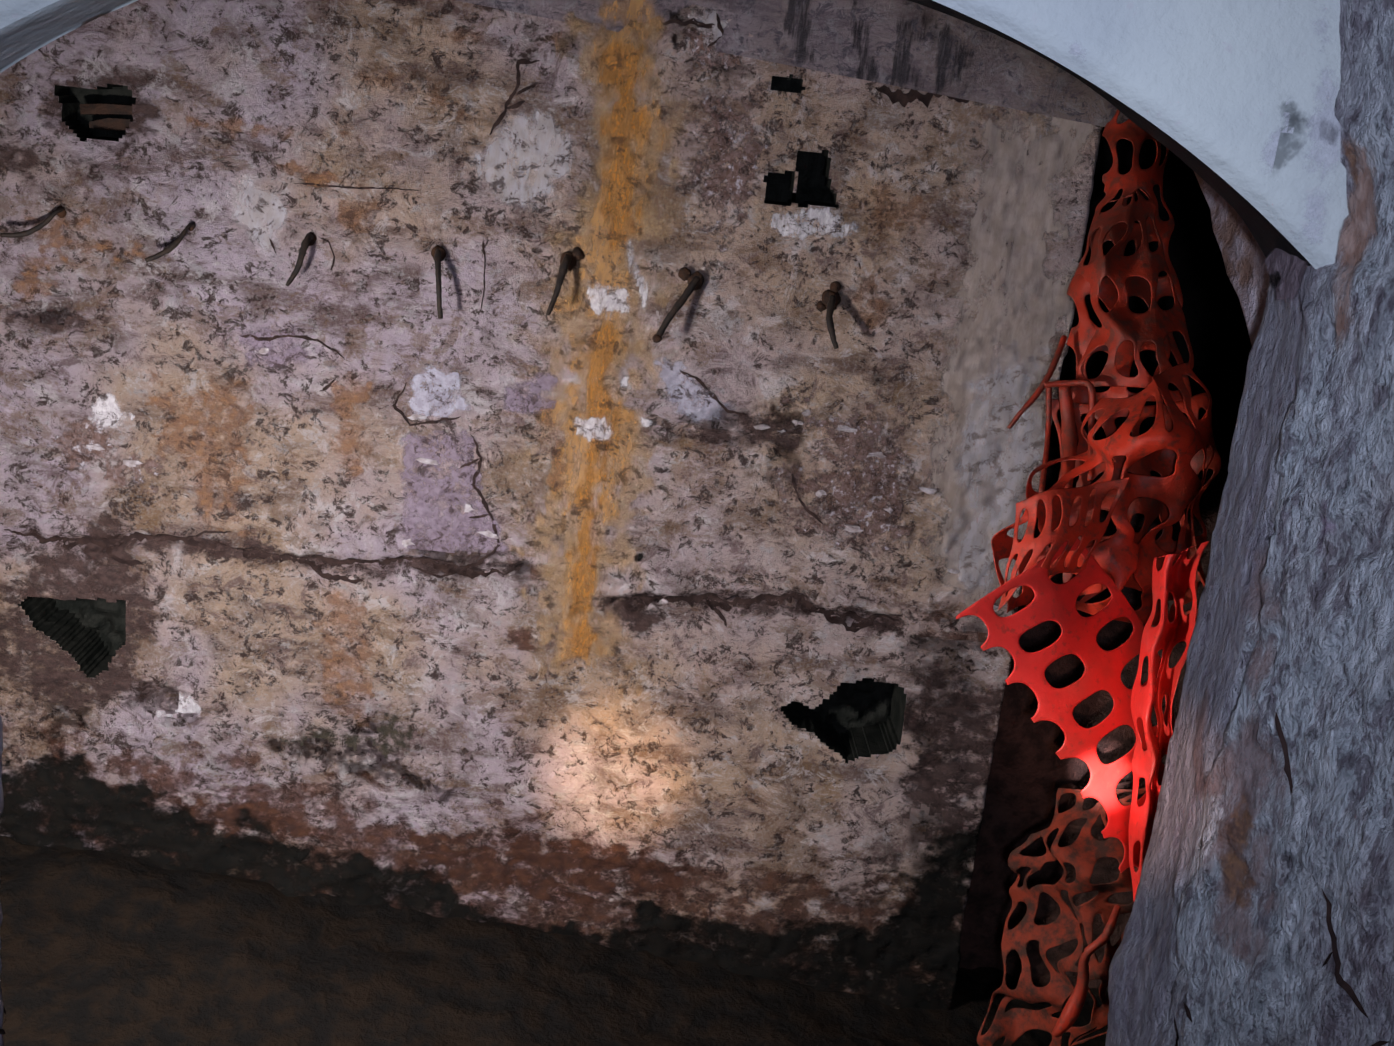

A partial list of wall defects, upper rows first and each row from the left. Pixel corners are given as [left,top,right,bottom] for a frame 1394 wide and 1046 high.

hole [54,84,136,142]
spalling [673,74,806,252]
corrosion [541,0,665,661]
peeling [655,104,1093,609]
hole [18,596,126,678]
crack [621,589,909,636]
hole [781,678,907,764]
crack [1321,888,1389,1046]